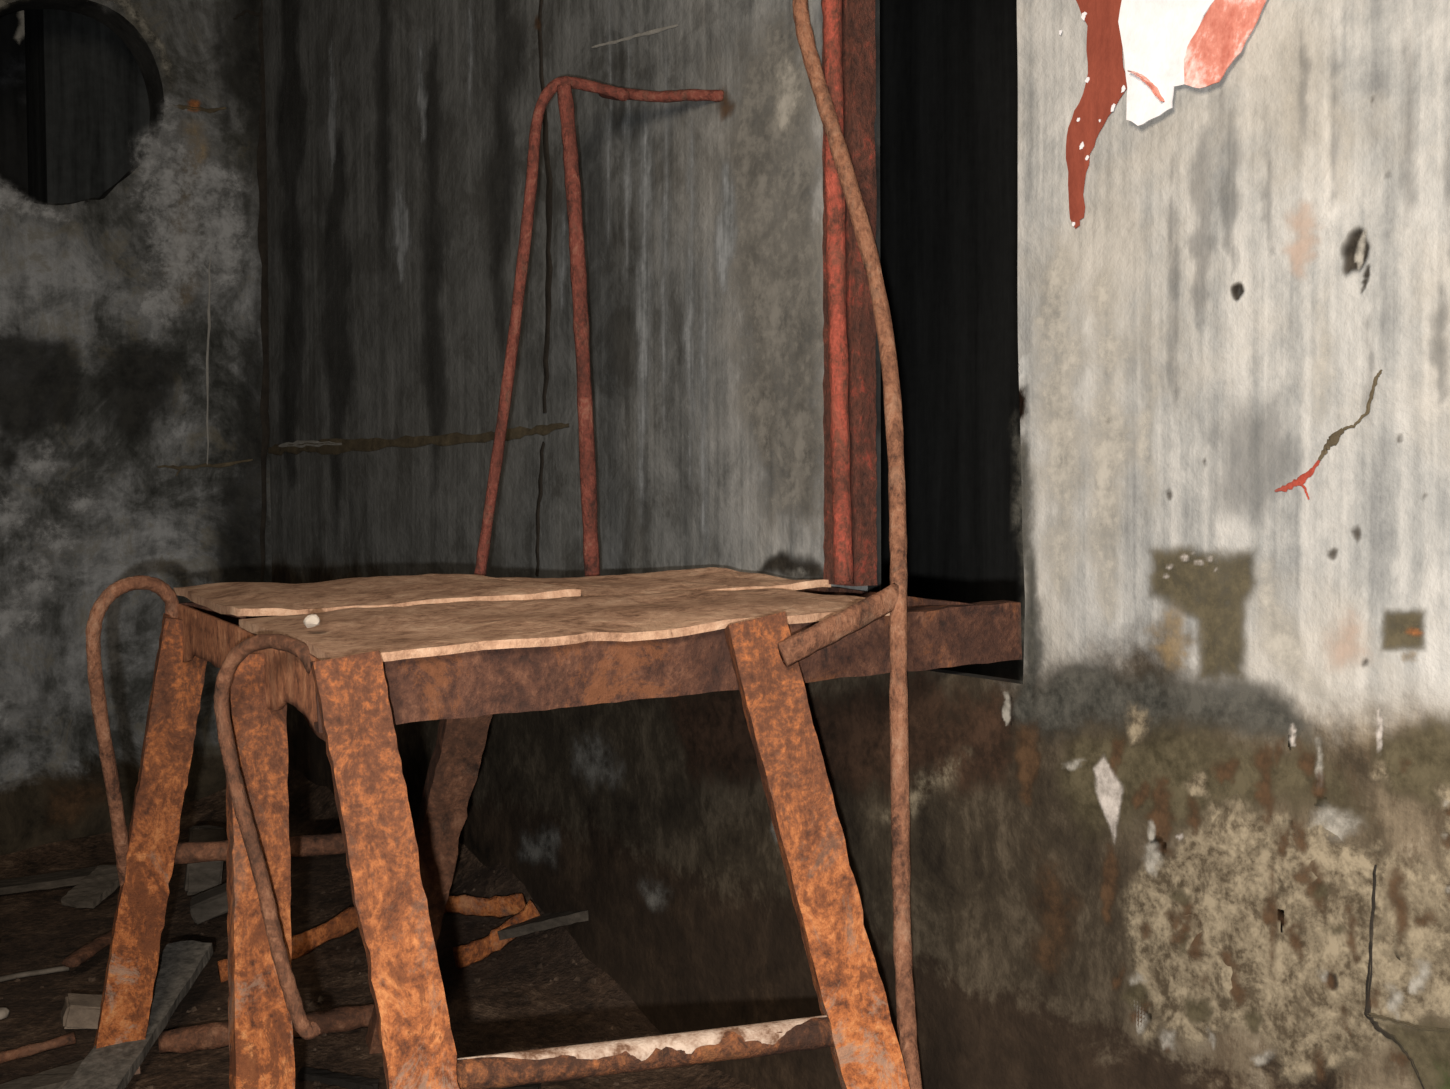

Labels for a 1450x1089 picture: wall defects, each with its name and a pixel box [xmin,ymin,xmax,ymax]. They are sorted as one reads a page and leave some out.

peeling [1066,0,1267,229]
crack [1275,369,1383,500]
leakage [1377,710,1450,804]
spalling [1128,789,1450,1082]
crack [1364,865,1445,1089]